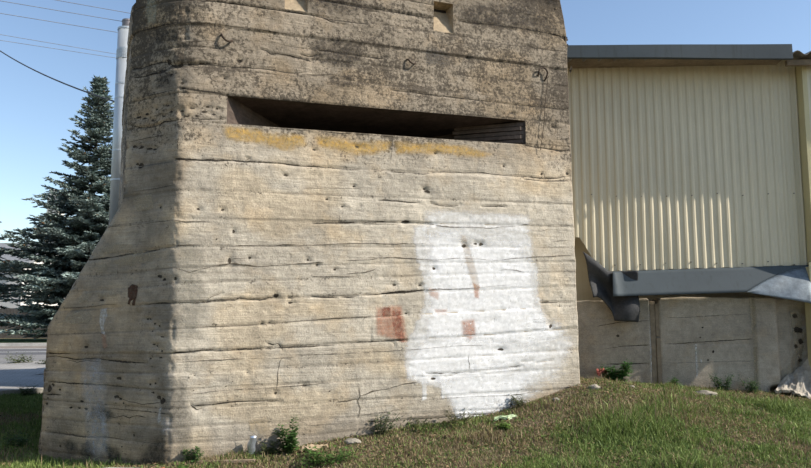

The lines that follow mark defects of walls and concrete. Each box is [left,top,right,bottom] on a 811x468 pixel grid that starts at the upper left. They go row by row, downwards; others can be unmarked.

crack [176,158,353,189]
crack [107,220,205,228]
crack [86,244,203,261]
corrosion [128,284,138,305]
crack [148,294,289,305]
crack [175,200,572,424]
corrosion [377,307,405,341]
crack [49,352,143,363]
crack [47,381,167,444]